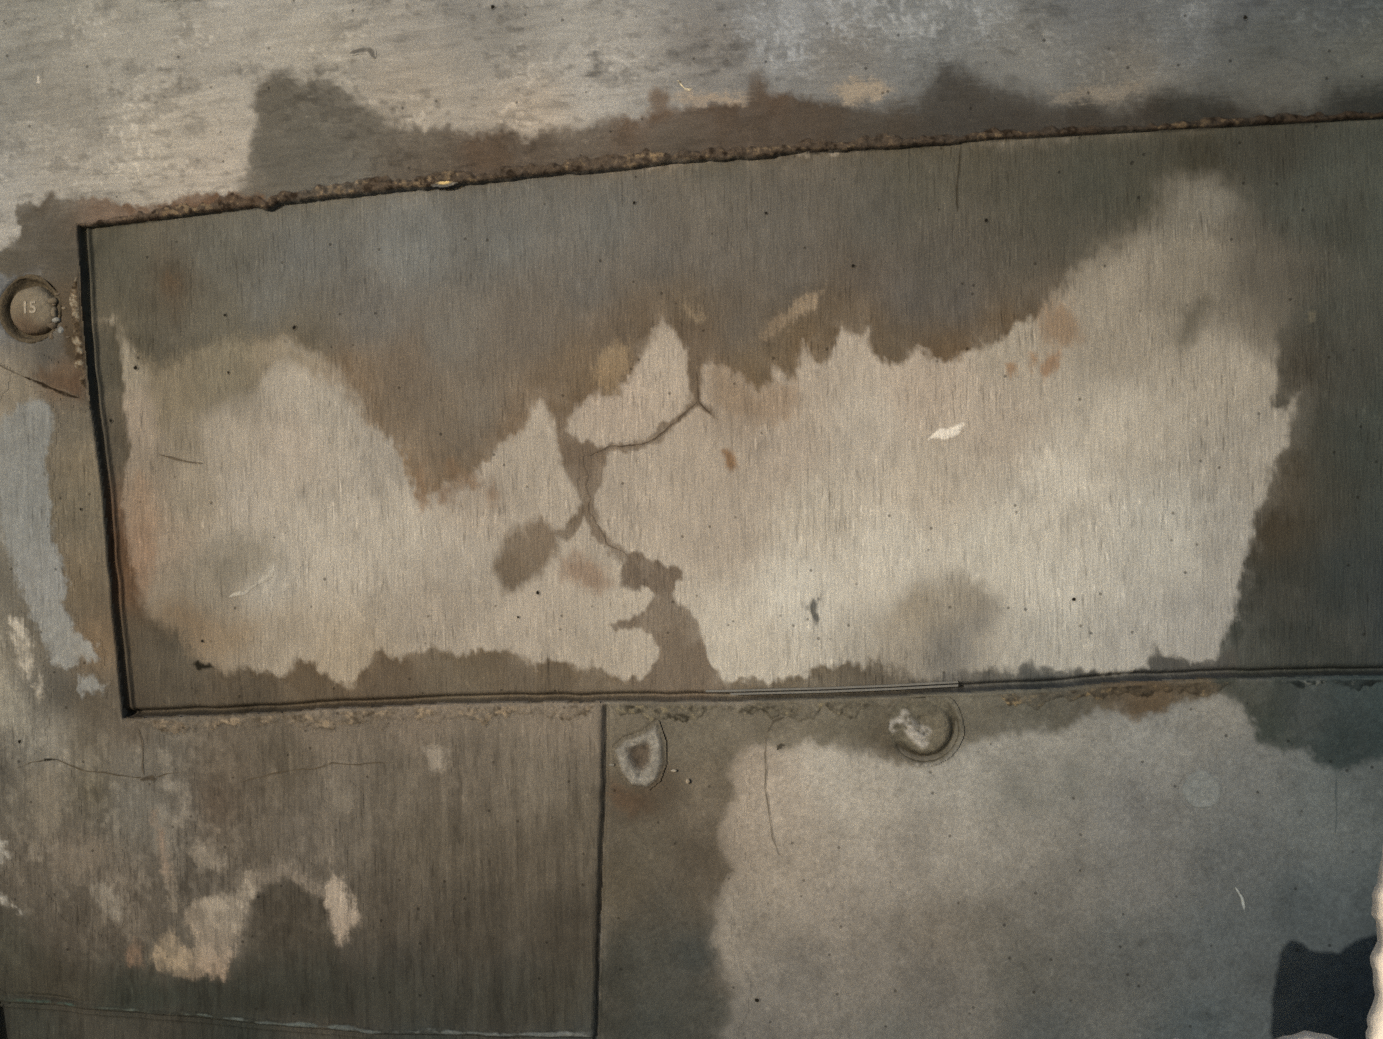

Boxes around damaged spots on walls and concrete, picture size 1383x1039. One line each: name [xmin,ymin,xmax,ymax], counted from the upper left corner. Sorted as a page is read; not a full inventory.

leakage [0,313,771,1039]
leakage [0,60,1383,785]
leakage [479,0,1383,165]